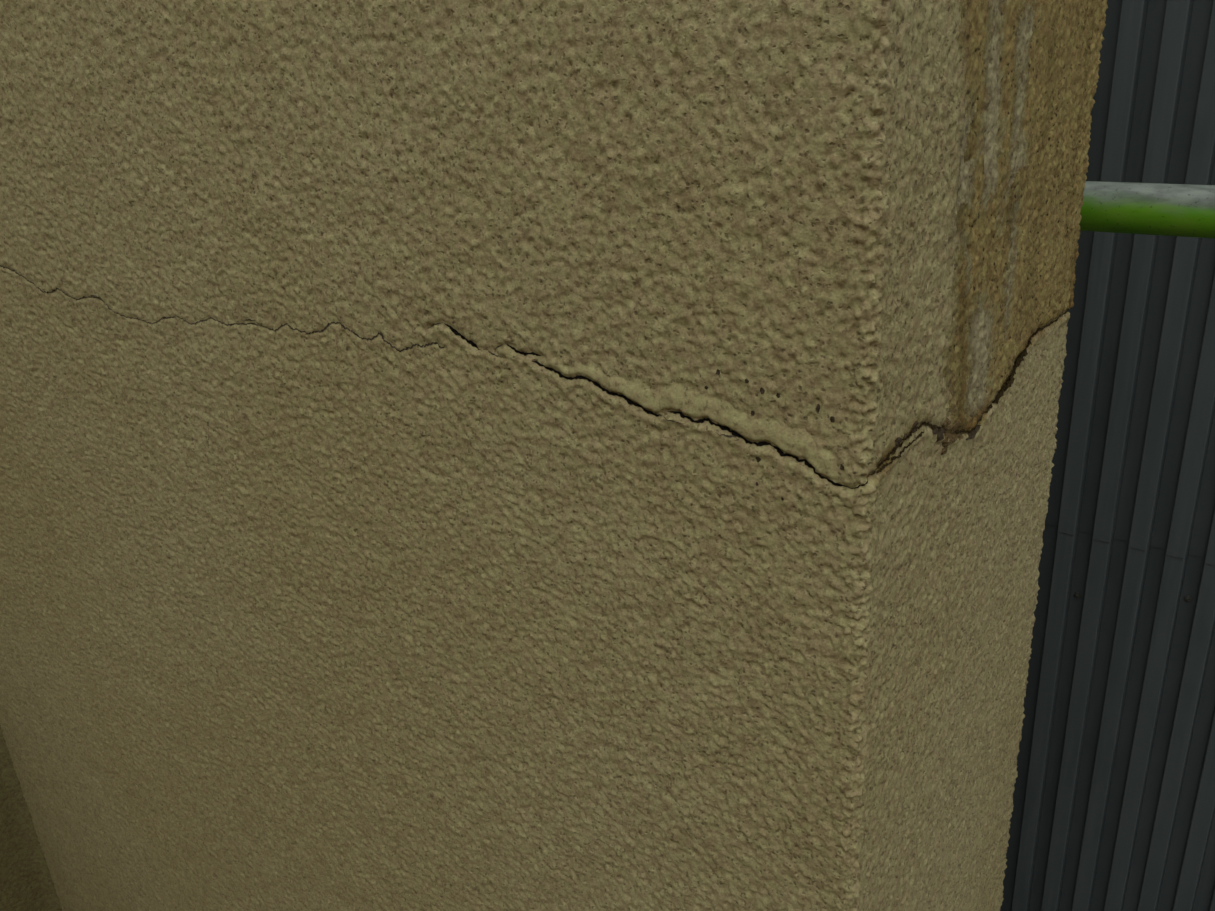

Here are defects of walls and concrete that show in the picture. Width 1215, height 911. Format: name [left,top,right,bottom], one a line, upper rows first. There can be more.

crack [0,265,1069,489]